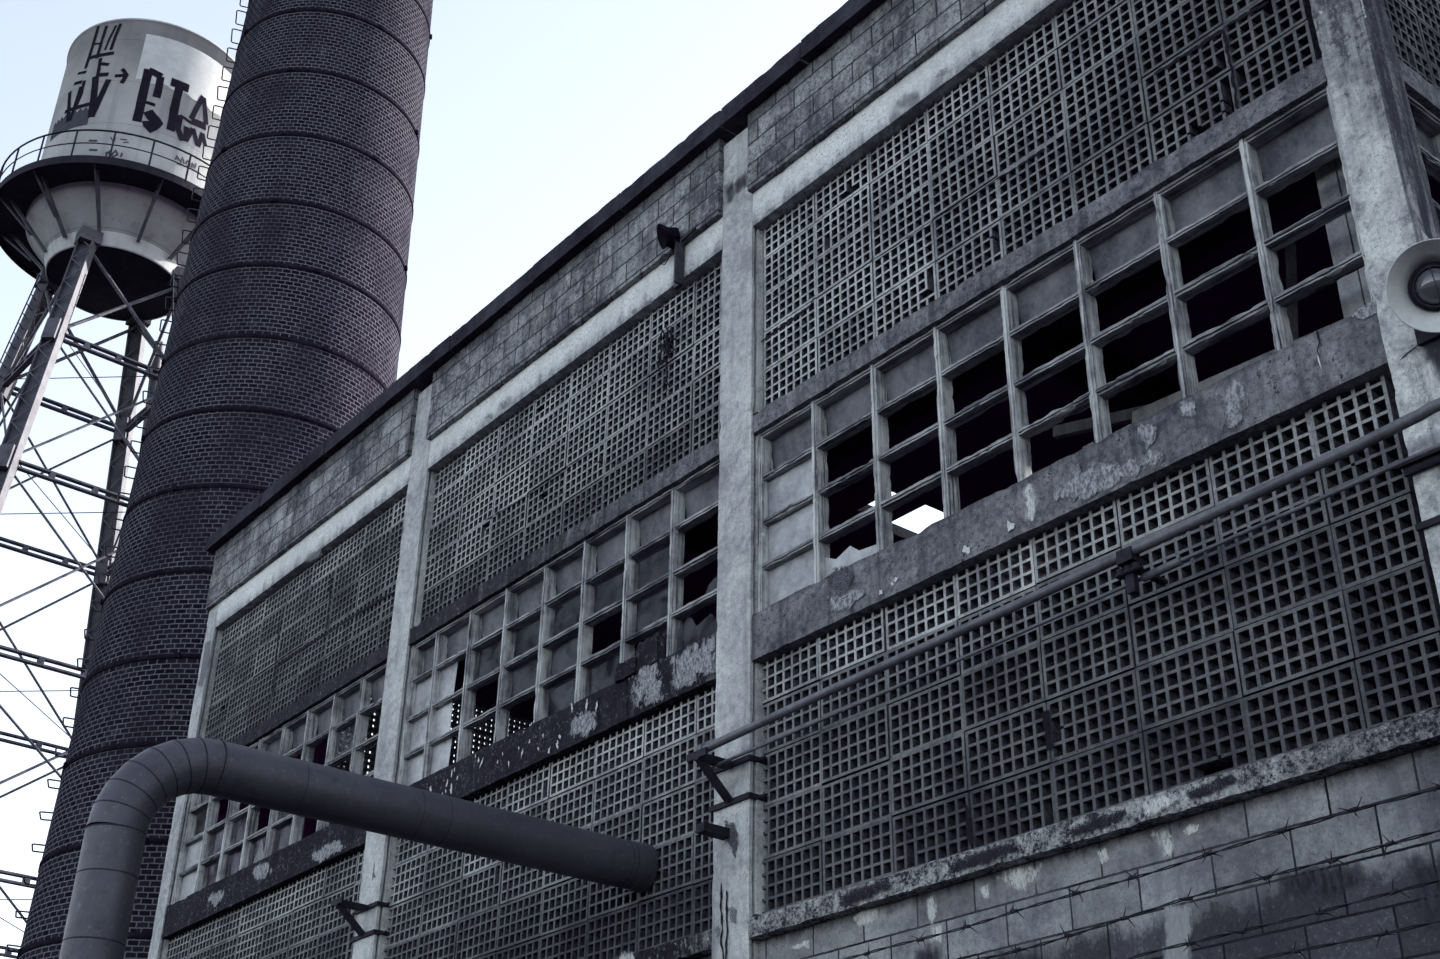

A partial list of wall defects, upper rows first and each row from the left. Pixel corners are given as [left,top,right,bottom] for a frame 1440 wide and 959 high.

peeling [614,632,716,710]
peeling [475,699,598,769]
leakage [839,877,892,926]
leakage [917,897,942,959]
leakage [949,841,1041,900]
efflorescence [1163,905,1191,959]